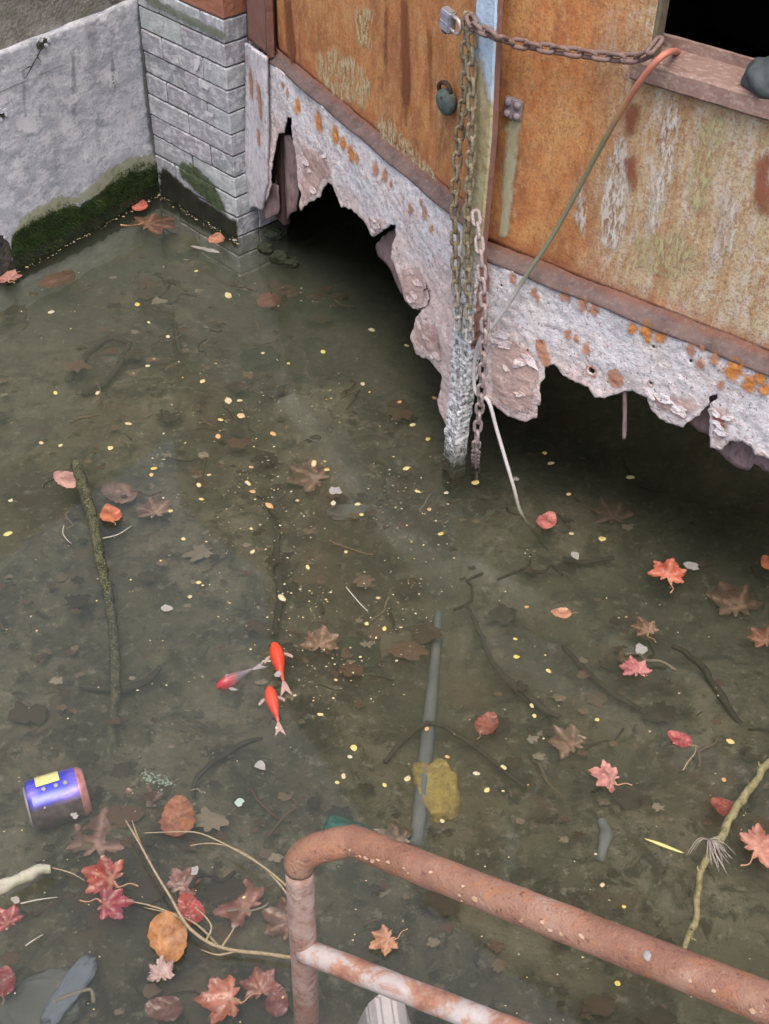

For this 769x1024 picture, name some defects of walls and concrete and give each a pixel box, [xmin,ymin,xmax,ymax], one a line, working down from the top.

peeling [316,49,370,108]
corrosion [400,0,410,119]
corrosion [315,111,358,163]
corrosion [626,156,636,187]
corrosion [755,156,769,213]
damp [7,168,238,286]
peeling [406,269,422,303]
peeling [490,330,538,372]
corrosion [564,330,590,354]
corrosion [628,321,667,344]
peeling [643,380,687,418]
peeling [710,408,734,437]